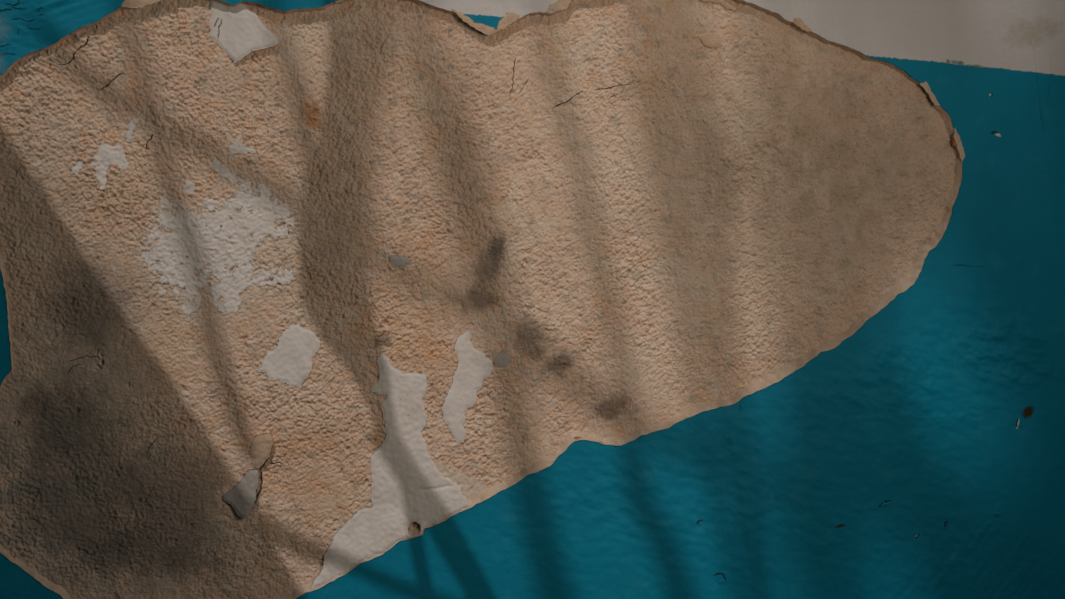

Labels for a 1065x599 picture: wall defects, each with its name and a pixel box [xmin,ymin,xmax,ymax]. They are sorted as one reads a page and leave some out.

crack [0,0,43,55]
spalling [209,0,279,63]
spalling [732,0,920,85]
spalling [926,93,965,164]
spalling [90,143,129,190]
spalling [141,179,295,320]
spalling [258,323,321,387]
spalling [430,146,962,527]
spalling [223,469,259,518]
spalling [312,353,469,588]
spalling [0,545,71,599]
spalling [276,544,395,599]